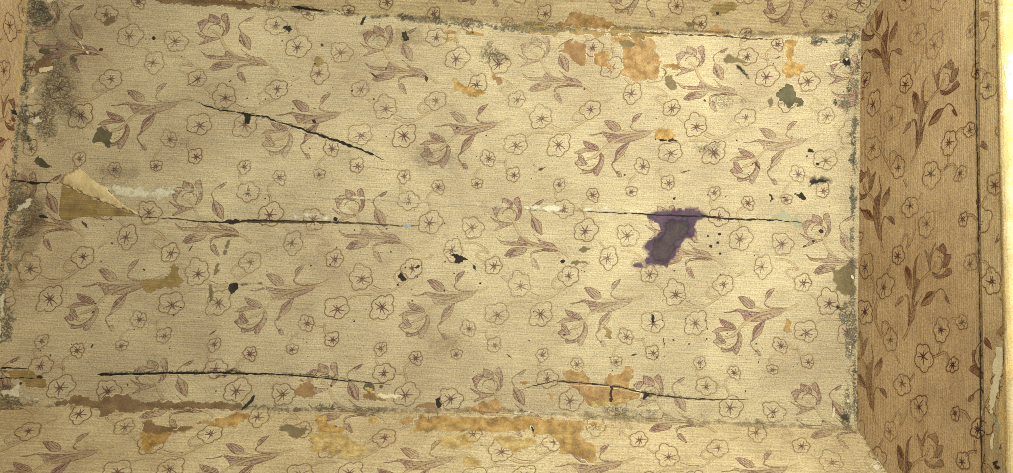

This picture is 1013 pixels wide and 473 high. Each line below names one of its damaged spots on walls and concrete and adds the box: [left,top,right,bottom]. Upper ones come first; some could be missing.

water stain [29,0,51,31]
water stain [20,56,35,145]
crack [187,99,396,170]
peeling [61,167,141,216]
crack [140,216,419,227]
crack [98,368,390,385]
crack [472,380,749,400]
water stain [269,404,394,413]
water stain [280,424,306,438]